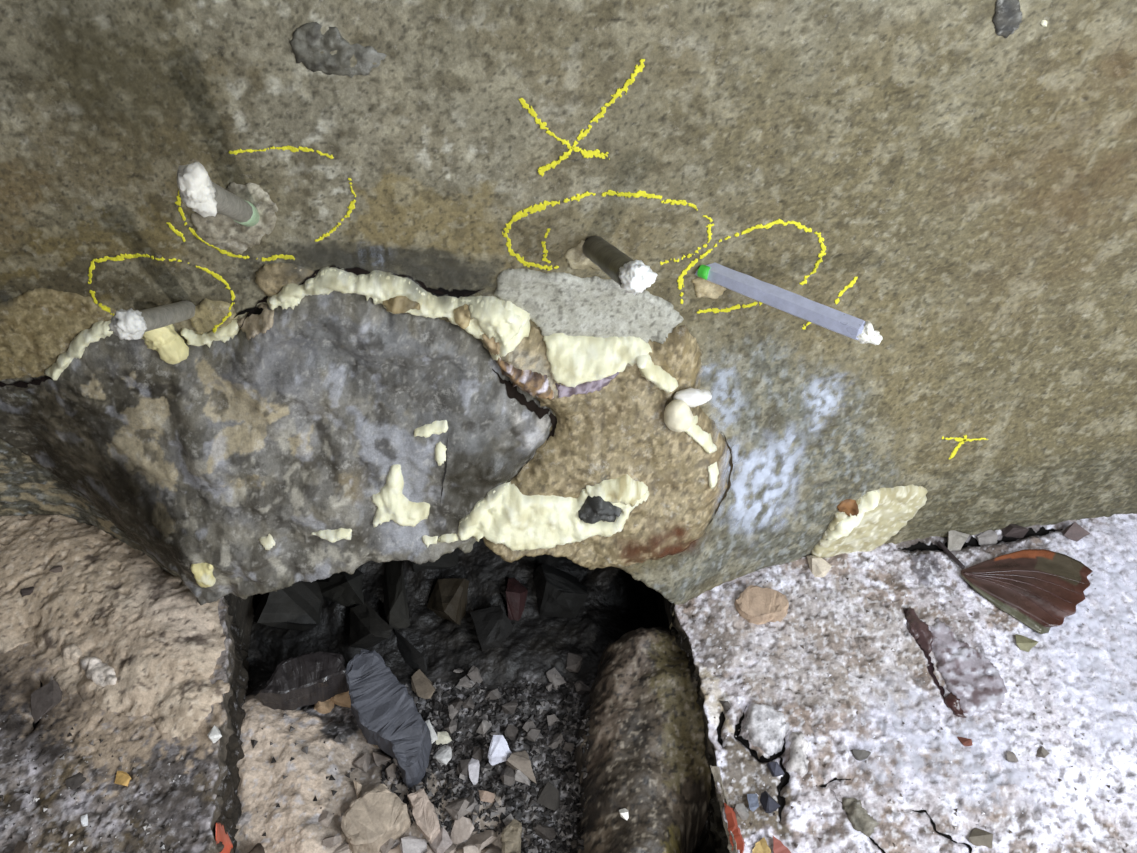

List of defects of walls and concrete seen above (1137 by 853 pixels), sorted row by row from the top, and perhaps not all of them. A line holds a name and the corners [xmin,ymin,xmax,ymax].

peeling [190,262,316,341]
peeling [382,296,421,314]
spalling [692,277,726,299]
peeling [0,288,117,381]
crack [0,376,53,388]
spalling [482,334,554,400]
leakage [707,368,737,422]
leakage [810,383,836,428]
peeling [586,474,648,507]
leakage [726,432,796,526]
crack [717,706,851,823]
crack [905,810,972,853]